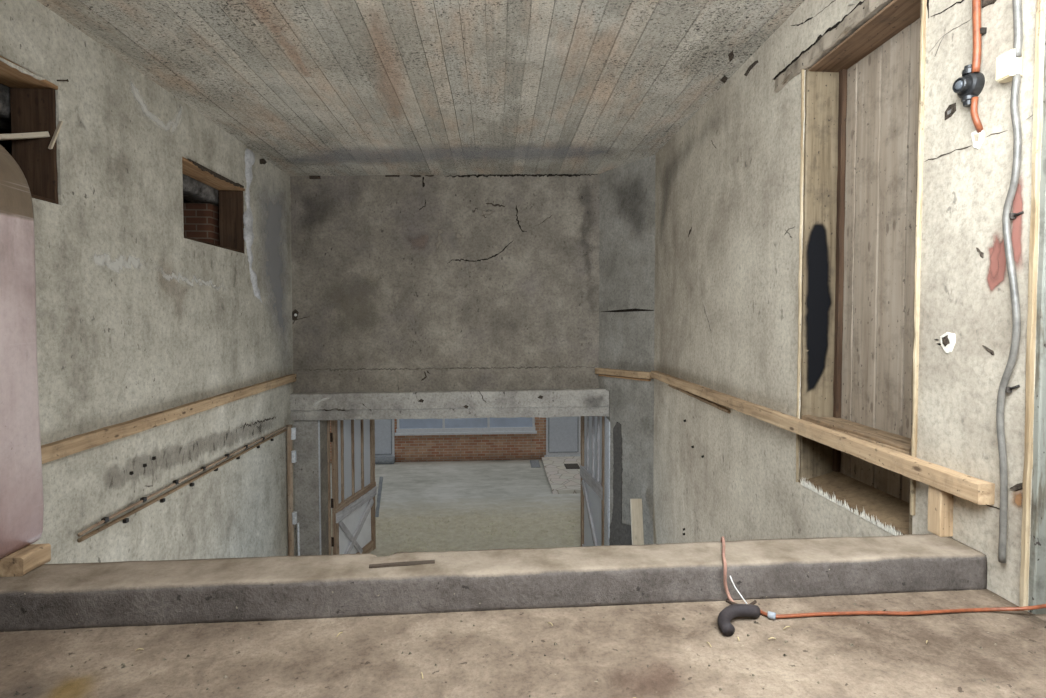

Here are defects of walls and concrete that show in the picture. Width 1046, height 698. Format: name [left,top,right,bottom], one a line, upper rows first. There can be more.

crack [419,174,598,210]
crack [449,203,552,263]
crack [601,306,654,314]